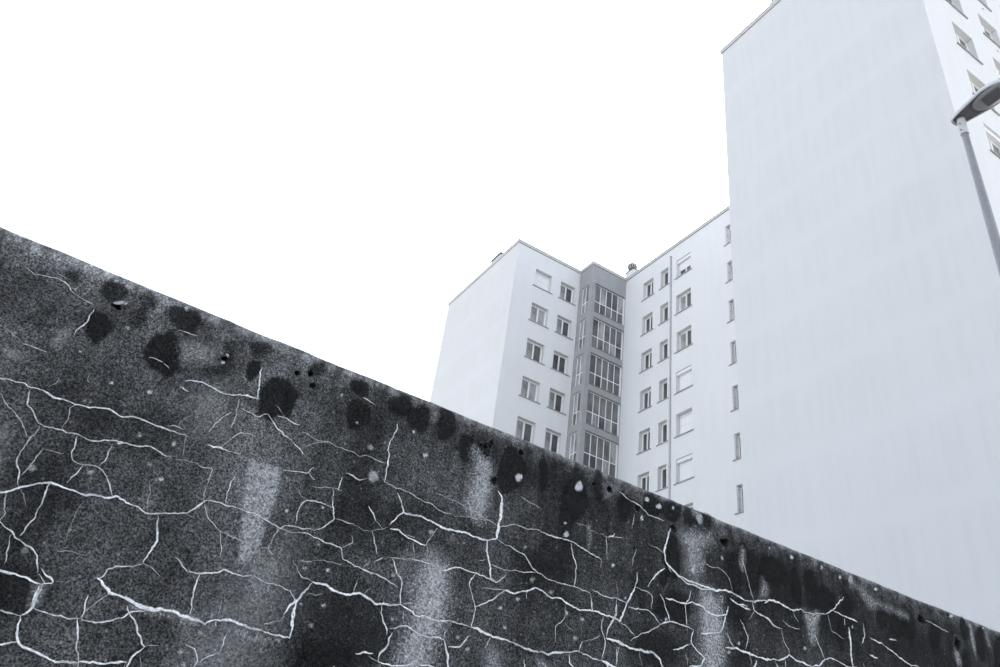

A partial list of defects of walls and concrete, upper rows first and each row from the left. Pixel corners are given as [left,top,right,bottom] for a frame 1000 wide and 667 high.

crack [27,268,94,333]
leakage [101,280,128,301]
leakage [142,306,201,377]
leakage [246,342,299,421]
leakage [346,380,370,429]
leakage [238,460,281,565]
leakage [389,394,526,526]
crack [0,357,918,667]
leakage [559,469,605,526]
leakage [293,550,455,667]
leakage [639,492,853,667]
leakage [955,618,1000,667]